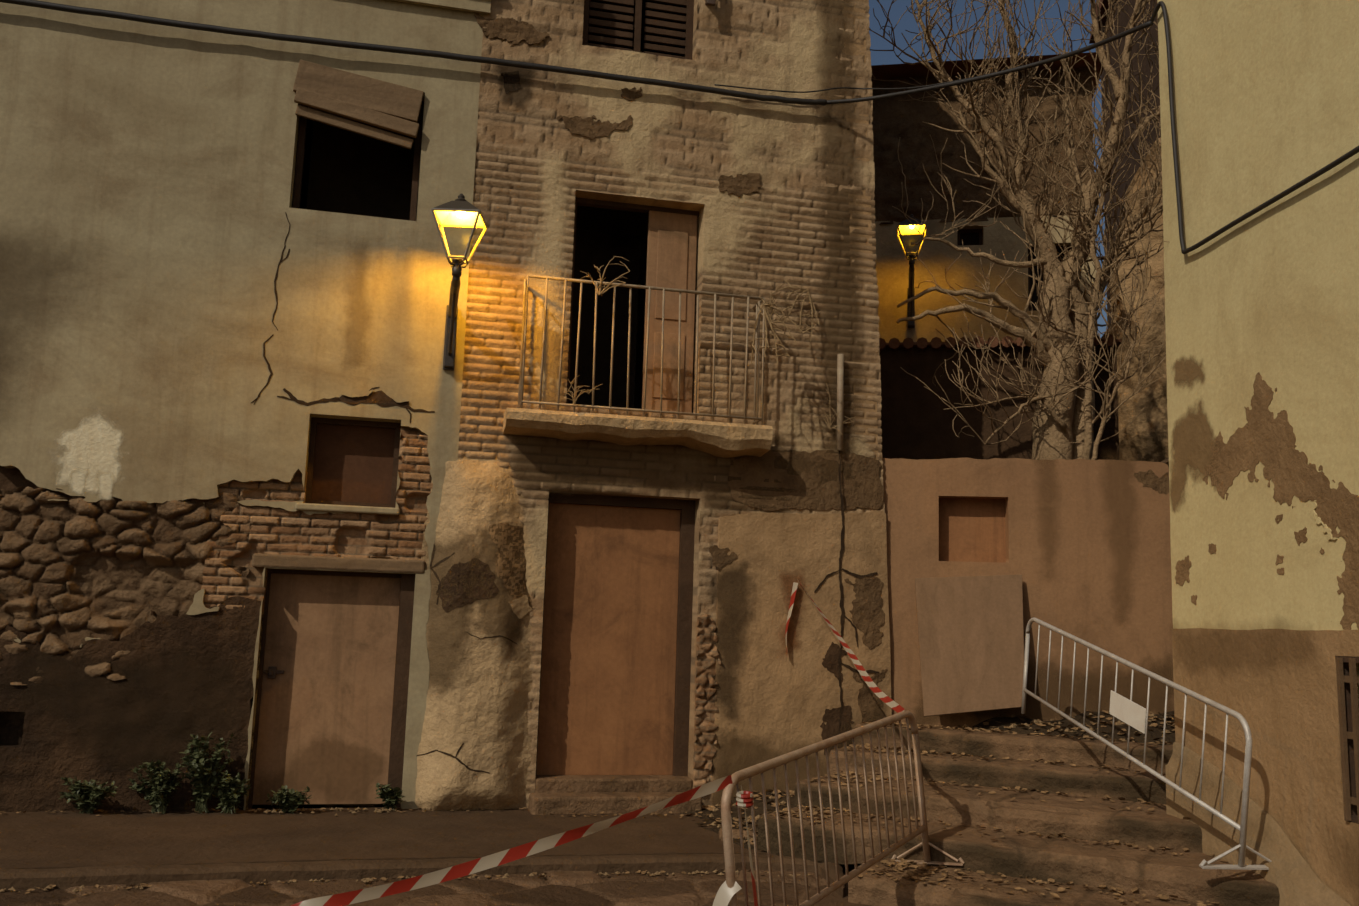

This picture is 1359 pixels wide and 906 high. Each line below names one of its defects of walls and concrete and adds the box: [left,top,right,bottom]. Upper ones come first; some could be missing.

flaking render [0,414,433,681]
crack [251,212,435,423]
spalling [339,389,409,409]
peeling [1134,372,1359,630]